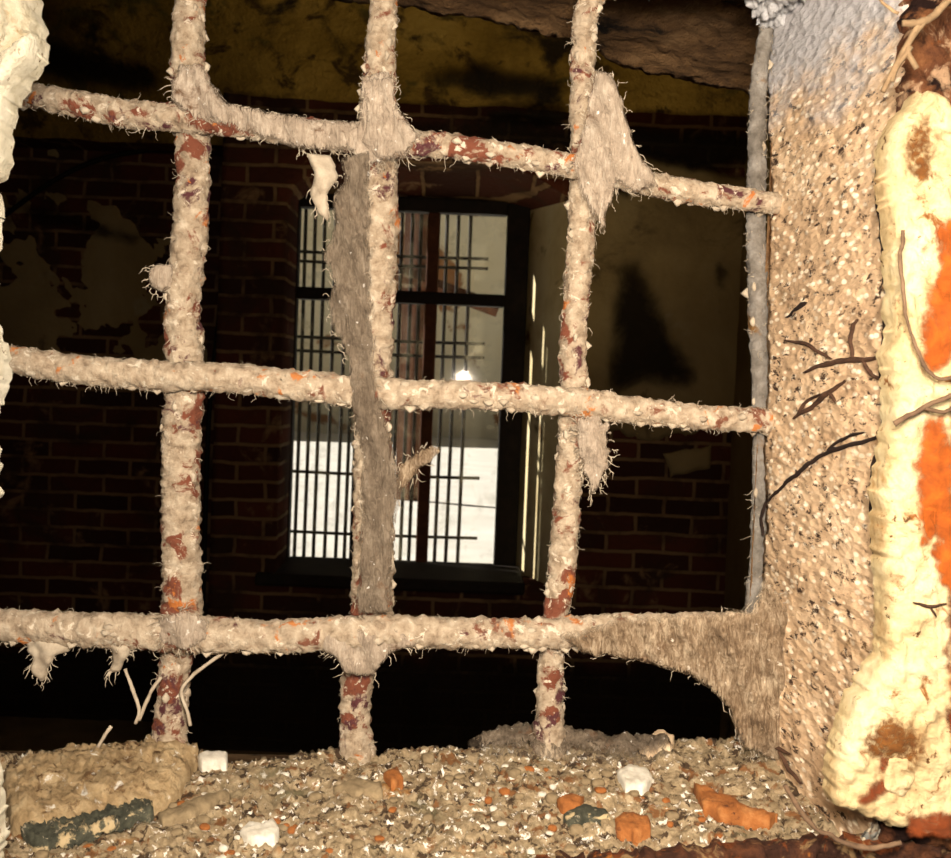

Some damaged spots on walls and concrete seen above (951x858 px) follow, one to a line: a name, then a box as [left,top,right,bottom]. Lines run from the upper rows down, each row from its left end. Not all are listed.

flaking render [0,0,171,408]
rust [921,219,951,372]
rust [913,416,951,685]
flaking render [0,763,10,858]
rust [859,757,888,804]
rust [908,812,951,838]